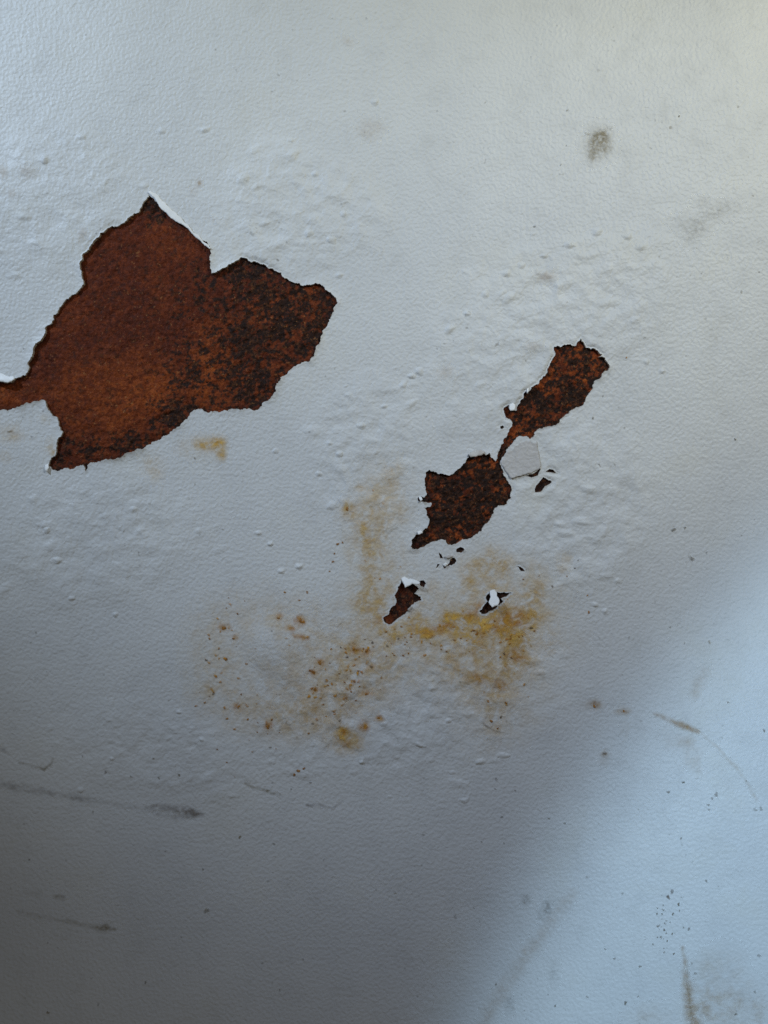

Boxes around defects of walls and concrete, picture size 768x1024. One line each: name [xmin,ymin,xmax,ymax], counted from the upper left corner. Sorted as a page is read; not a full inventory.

peeling [0,191,338,472]
peeling [410,339,610,569]
peeling [383,576,426,625]
rust [307,591,537,747]
peeling [479,589,512,614]